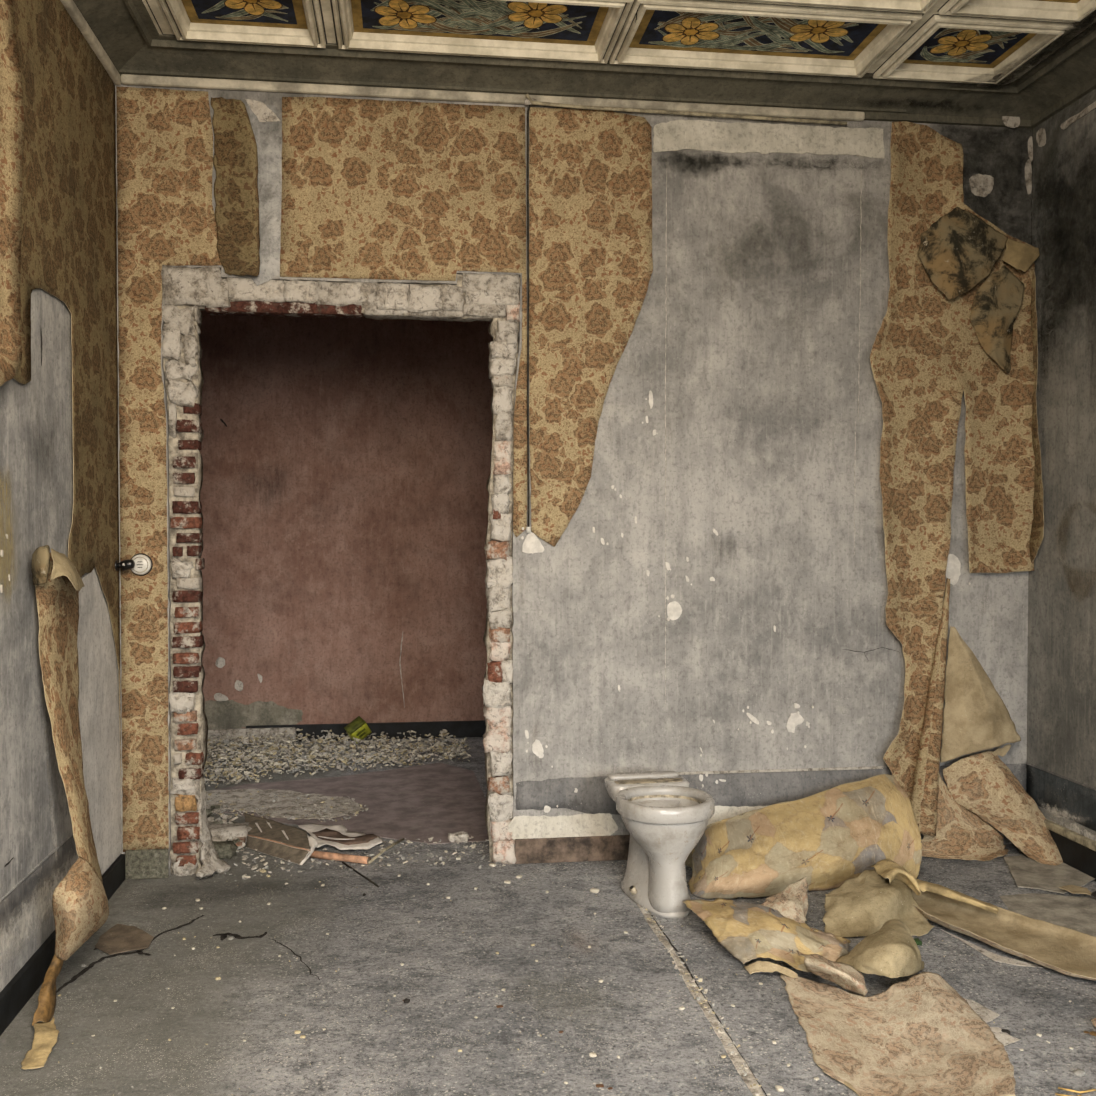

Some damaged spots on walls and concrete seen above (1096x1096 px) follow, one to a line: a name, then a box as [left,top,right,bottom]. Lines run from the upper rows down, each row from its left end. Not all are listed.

flaking render [653,120,885,159]
damp [661,157,741,170]
peeling [1025,128,1046,195]
peeling [969,174,994,197]
damp [941,126,1096,349]
spalling [521,527,544,554]
spalling [946,552,971,585]
spalling [658,594,682,621]
spalling [77,569,122,874]
peeling [922,626,1063,865]
spalling [206,789,365,819]
spalling [707,805,769,826]